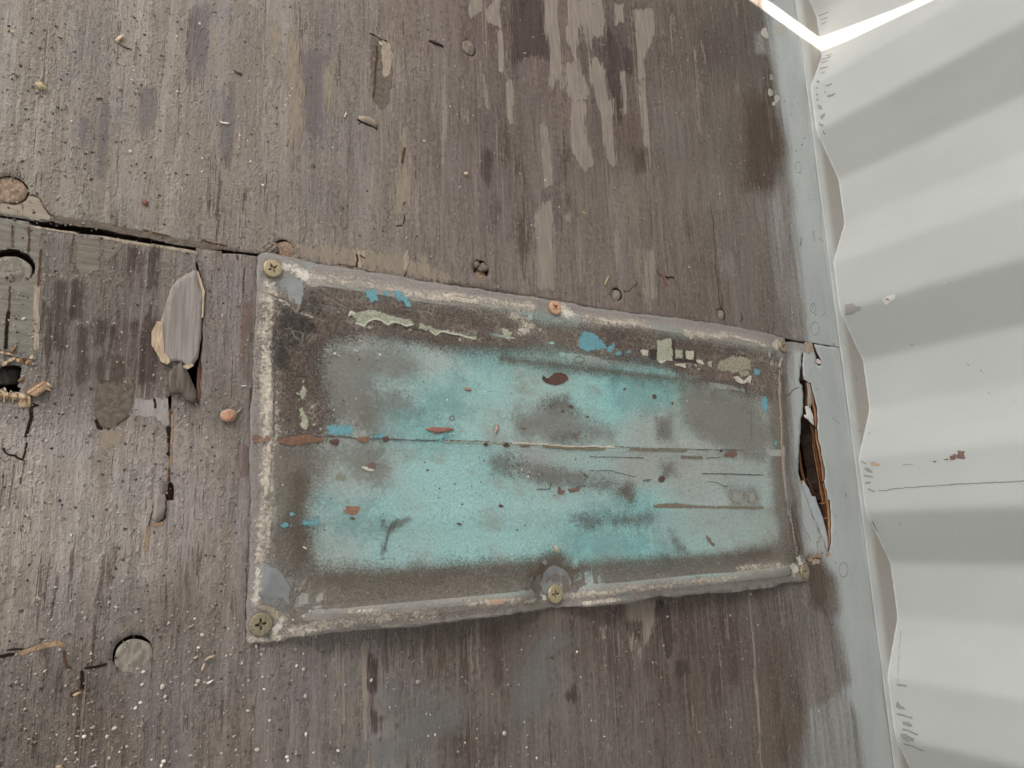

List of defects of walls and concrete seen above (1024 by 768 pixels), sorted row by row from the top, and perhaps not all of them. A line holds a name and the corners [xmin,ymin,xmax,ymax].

peeling [337,310,476,341]
peeling [542,373,569,385]
peeling [640,338,752,384]
peeling [253,380,339,446]
rust [257,283,801,633]
peeling [344,506,360,520]